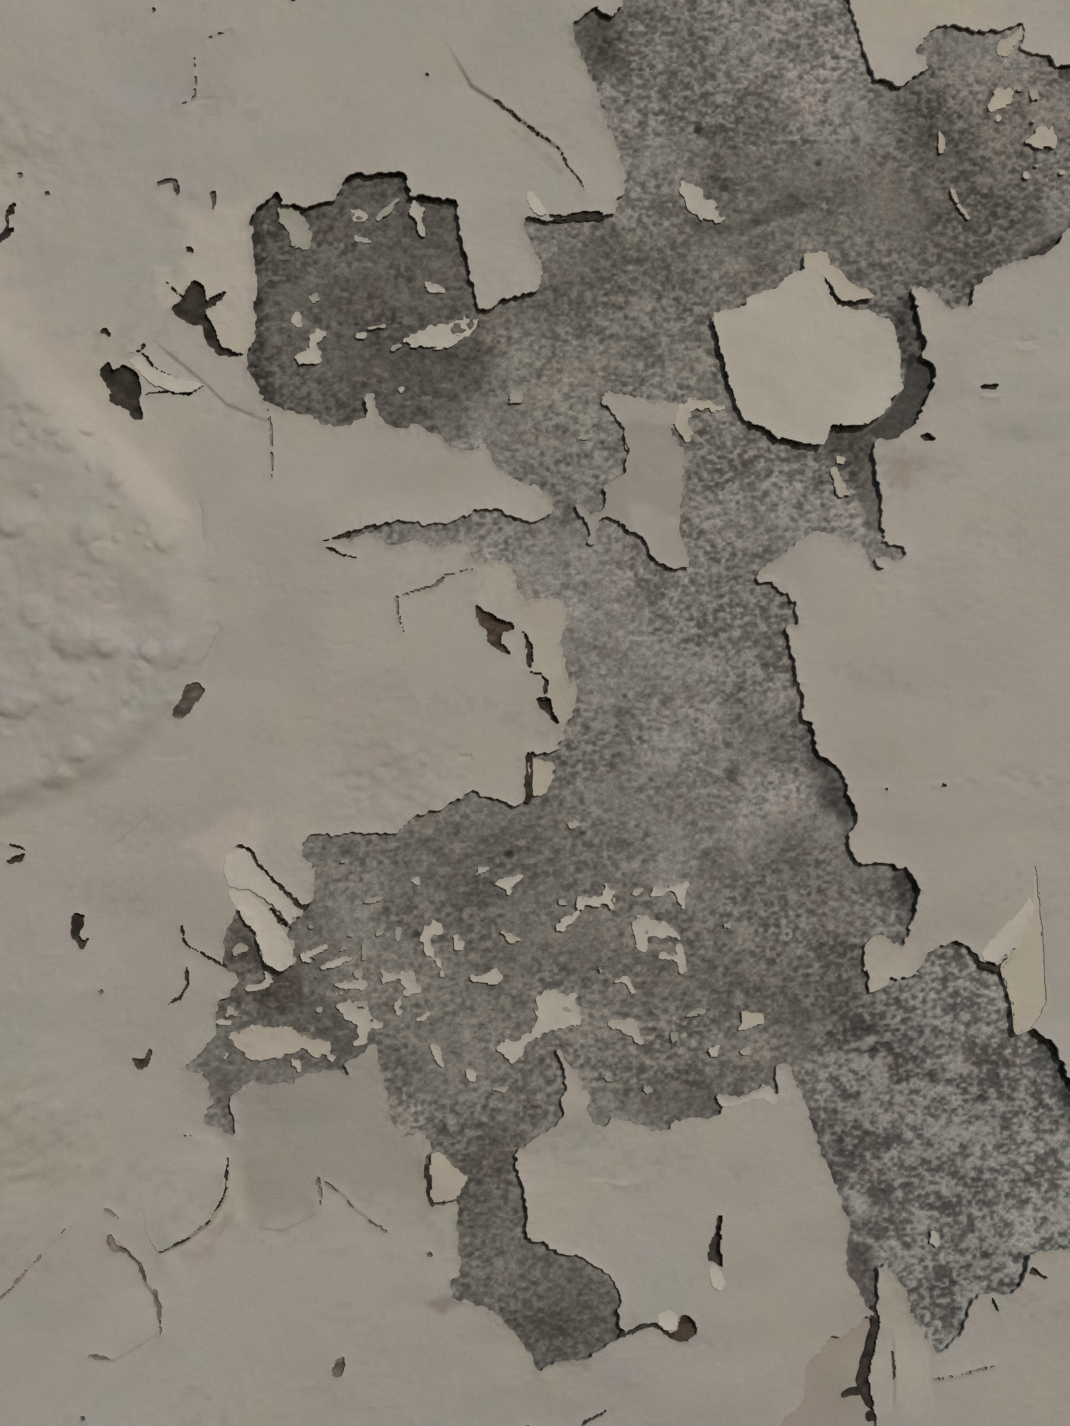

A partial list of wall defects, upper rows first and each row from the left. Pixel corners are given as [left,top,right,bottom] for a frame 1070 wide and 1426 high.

crack [494,100,606,223]
peeling [0,204,16,243]
peeling [172,281,243,357]
peeling [100,356,202,420]
peeling [172,682,205,720]
peeling [186,0,1070,1370]
peeling [141,1135,227,1251]
crack [0,1228,65,1300]
crack [104,1157,229,1334]
crack [89,1353,109,1361]
crack [842,1305,895,1409]
crack [934,1366,991,1380]